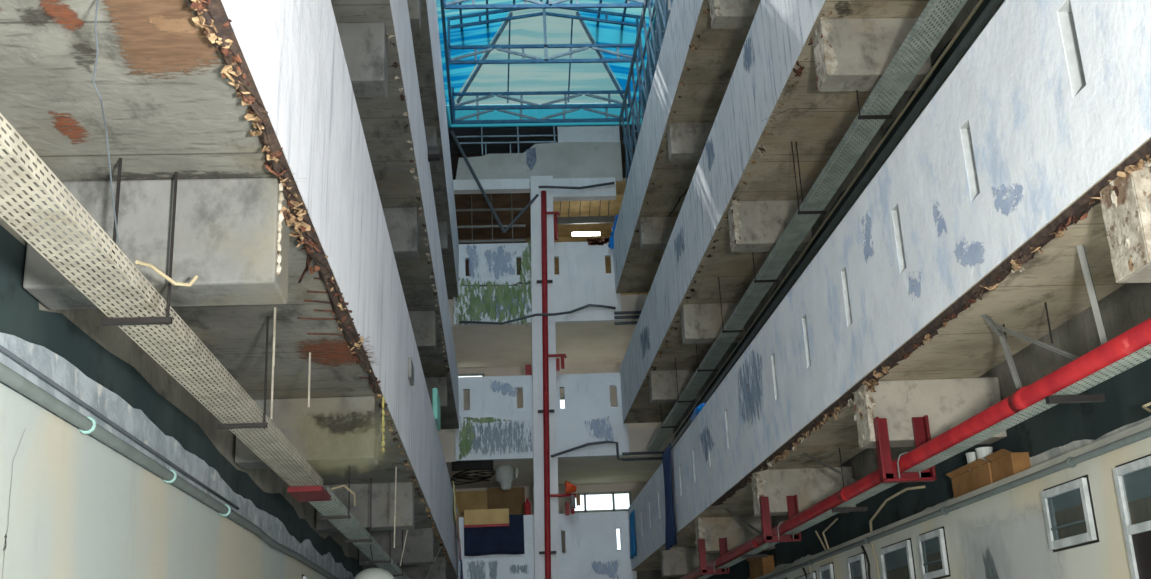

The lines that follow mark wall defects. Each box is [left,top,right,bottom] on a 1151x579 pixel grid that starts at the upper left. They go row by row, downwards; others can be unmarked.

corrosion [40,0,84,30]
corrosion [102,0,225,79]
corrosion [49,112,89,144]
spalling [188,0,451,566]
spalling [712,139,1151,516]
corrosion [296,339,376,367]
water stain [461,421,532,455]
peeling [699,428,715,461]
water stain [983,551,998,579]